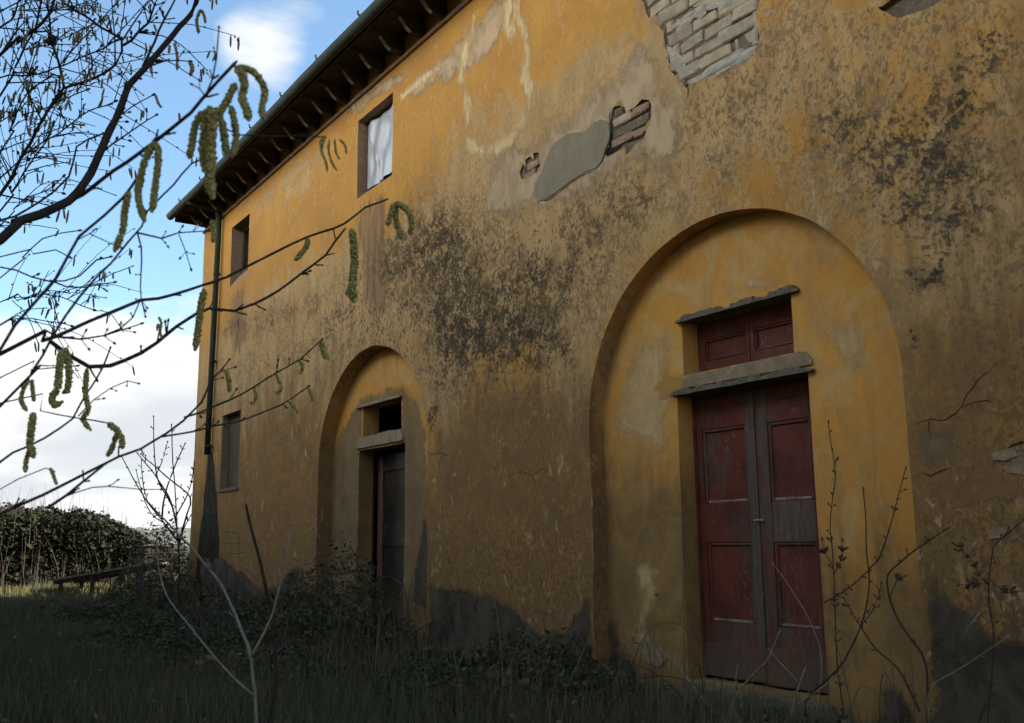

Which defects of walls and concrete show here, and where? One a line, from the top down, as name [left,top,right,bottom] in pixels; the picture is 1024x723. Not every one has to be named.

flaking render [486,0,760,221]
water stain [820,30,1013,292]
water stain [358,198,600,383]
crack [909,360,1000,438]
flaking render [991,447,1024,475]